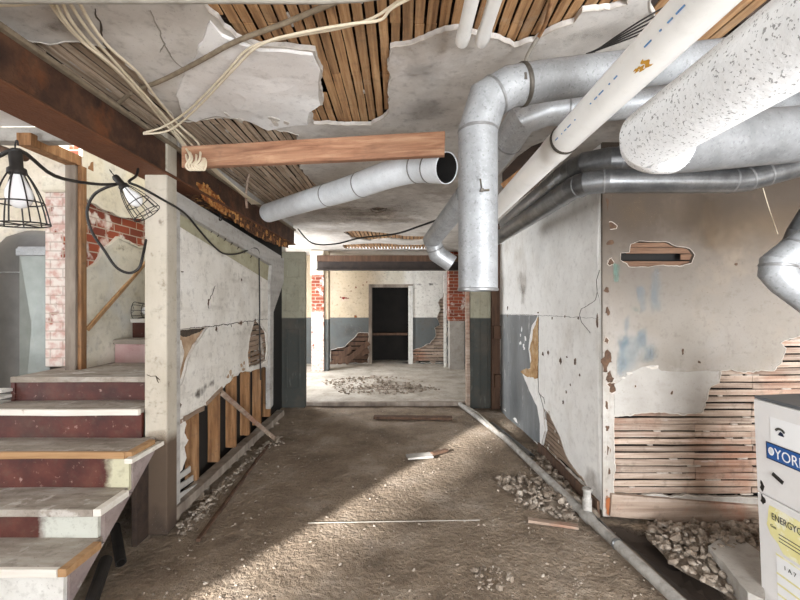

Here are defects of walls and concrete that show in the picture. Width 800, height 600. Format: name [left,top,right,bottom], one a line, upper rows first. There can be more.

flaking render [28,40,299,146]
crack [150,10,182,68]
flaking render [203,0,464,126]
flaking render [490,0,628,48]
flaking render [87,197,145,271]
flaking render [218,165,317,204]
flaking render [607,241,695,267]
flaking render [180,313,268,499]
crack [187,286,268,329]
peeling [500,306,586,486]
crack [516,270,600,420]
flaking render [601,336,800,498]